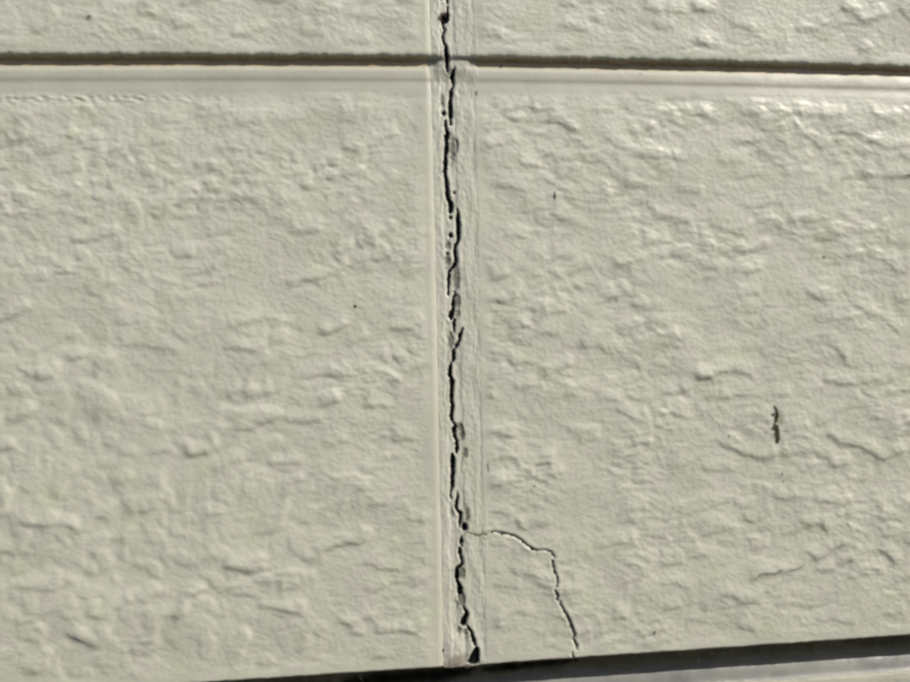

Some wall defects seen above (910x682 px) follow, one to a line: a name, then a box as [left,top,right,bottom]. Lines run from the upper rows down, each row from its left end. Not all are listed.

crack [441,0,578,658]